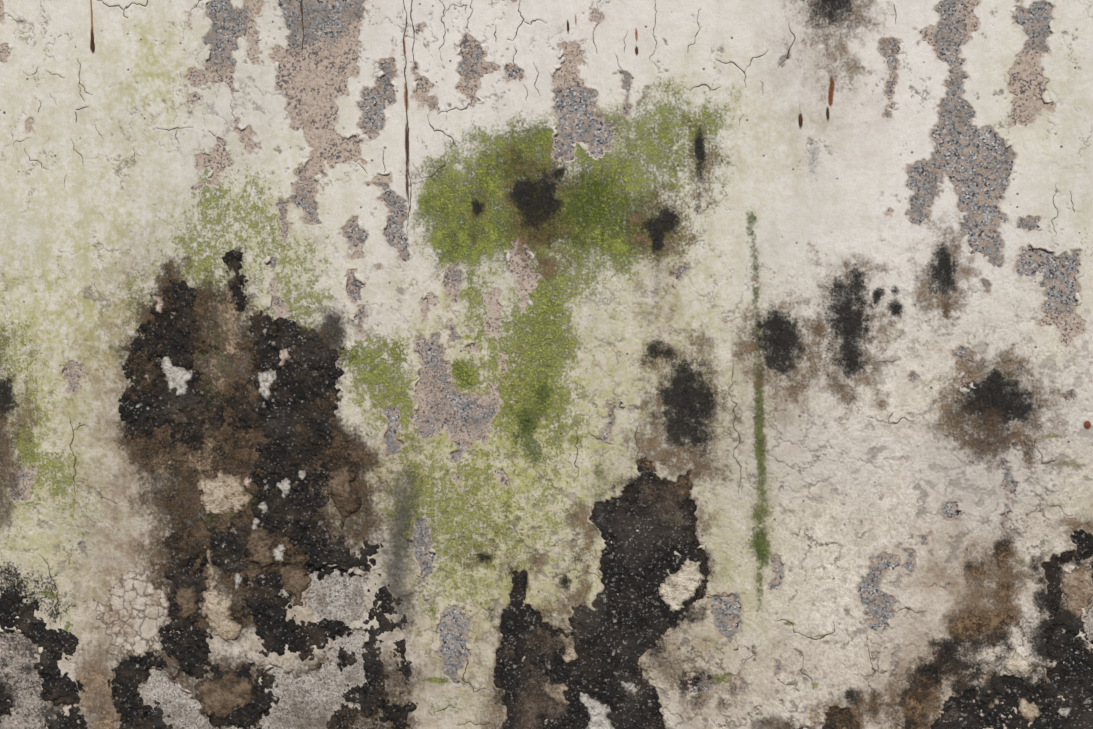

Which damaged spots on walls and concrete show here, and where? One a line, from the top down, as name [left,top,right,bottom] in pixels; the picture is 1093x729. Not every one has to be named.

water stain [0,247,418,729]
peeling [185,0,399,244]
peeling [342,171,415,339]
peeling [411,62,440,115]
crack [358,0,544,235]
peeling [549,42,616,161]
water stain [480,333,726,729]
water stain [734,261,903,407]
water stain [752,518,1093,729]
water stain [916,230,976,319]
peeling [878,0,1086,347]
water stain [936,349,1060,464]